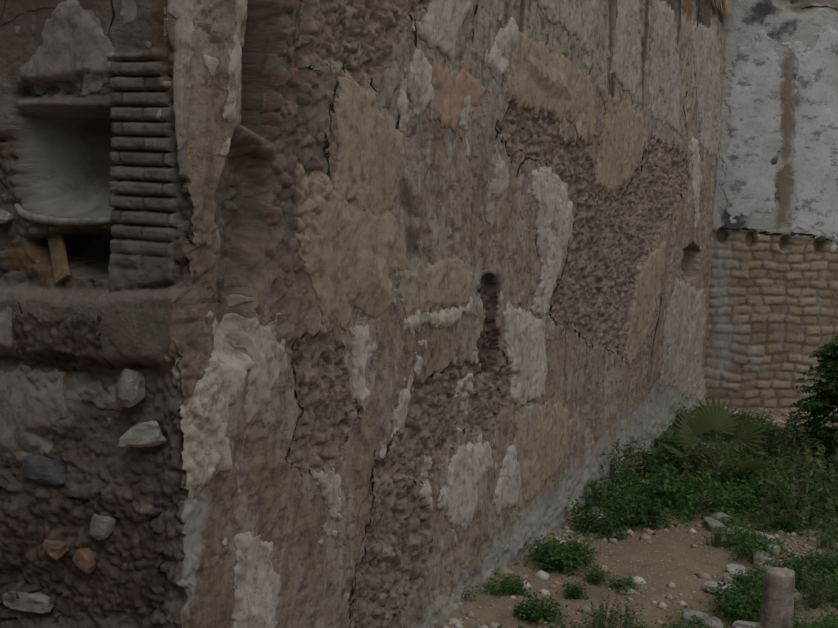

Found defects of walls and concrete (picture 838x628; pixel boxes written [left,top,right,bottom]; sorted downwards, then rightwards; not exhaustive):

peeling [19,0,117,96]
crack [107,0,115,47]
leakage [751,1,776,23]
spalling [172,0,838,628]
peeling [0,307,114,464]
peeling [77,380,123,425]
spalling [0,485,167,618]